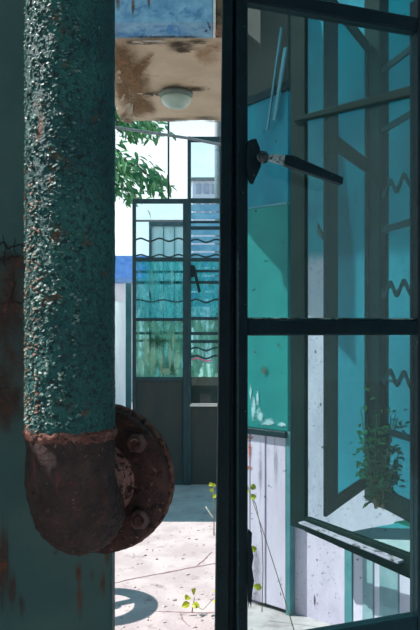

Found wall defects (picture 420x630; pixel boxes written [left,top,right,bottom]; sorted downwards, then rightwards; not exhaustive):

leakage [115,25,218,122]
crack [0,237,24,305]
peeling [249,388,285,427]